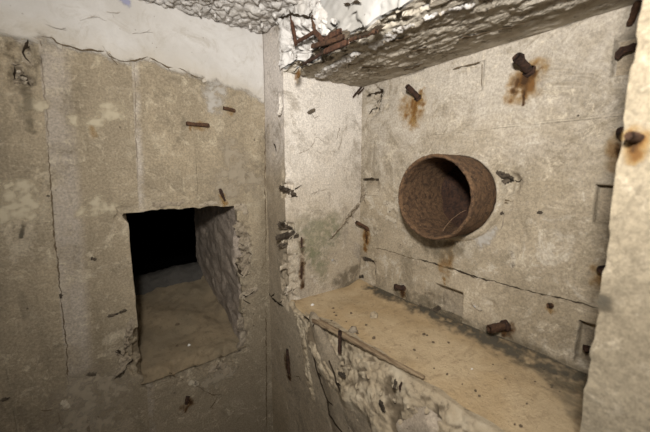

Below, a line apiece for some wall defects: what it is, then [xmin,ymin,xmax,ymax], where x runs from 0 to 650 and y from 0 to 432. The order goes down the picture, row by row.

spalling [283,0,643,98]